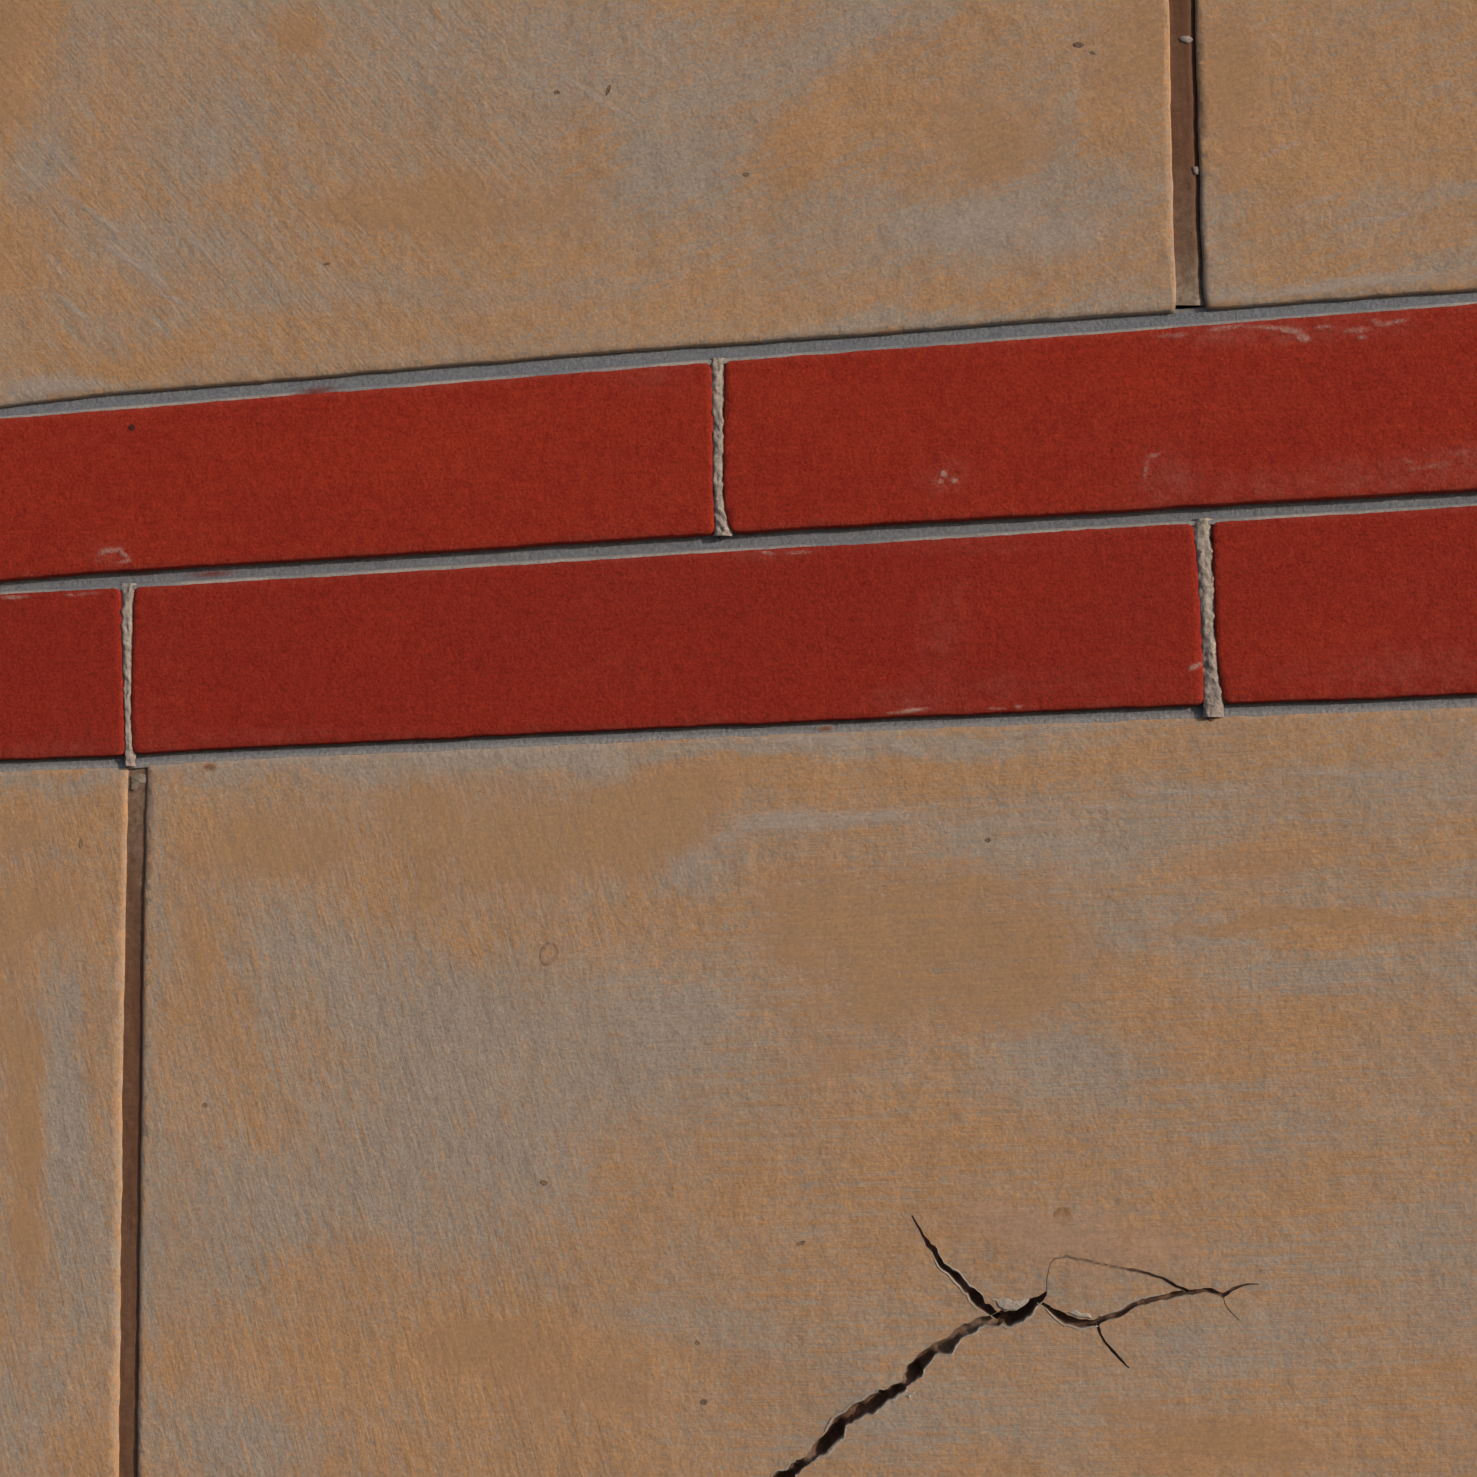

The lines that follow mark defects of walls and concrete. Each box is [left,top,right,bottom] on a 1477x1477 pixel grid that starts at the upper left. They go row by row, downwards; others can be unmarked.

crack [770,1215,1257,1477]